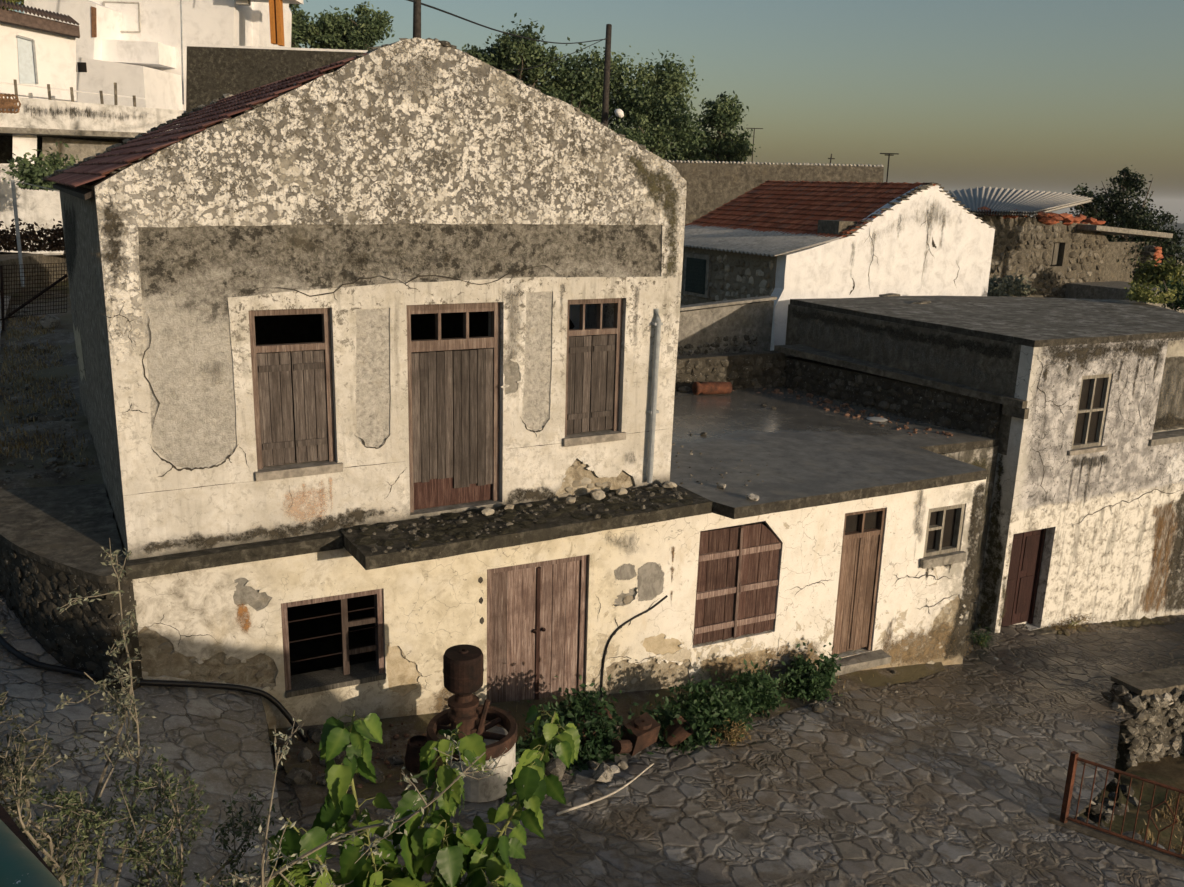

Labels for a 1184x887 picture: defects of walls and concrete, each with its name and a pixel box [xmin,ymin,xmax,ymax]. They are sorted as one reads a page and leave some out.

crack [66,287,252,496]
leakage [1043,340,1184,429]
spalling [554,458,634,498]
leakage [1165,492,1184,613]
spalling [228,578,272,611]
spalling [612,587,636,610]
spalling [138,626,278,692]
spalling [605,633,773,694]